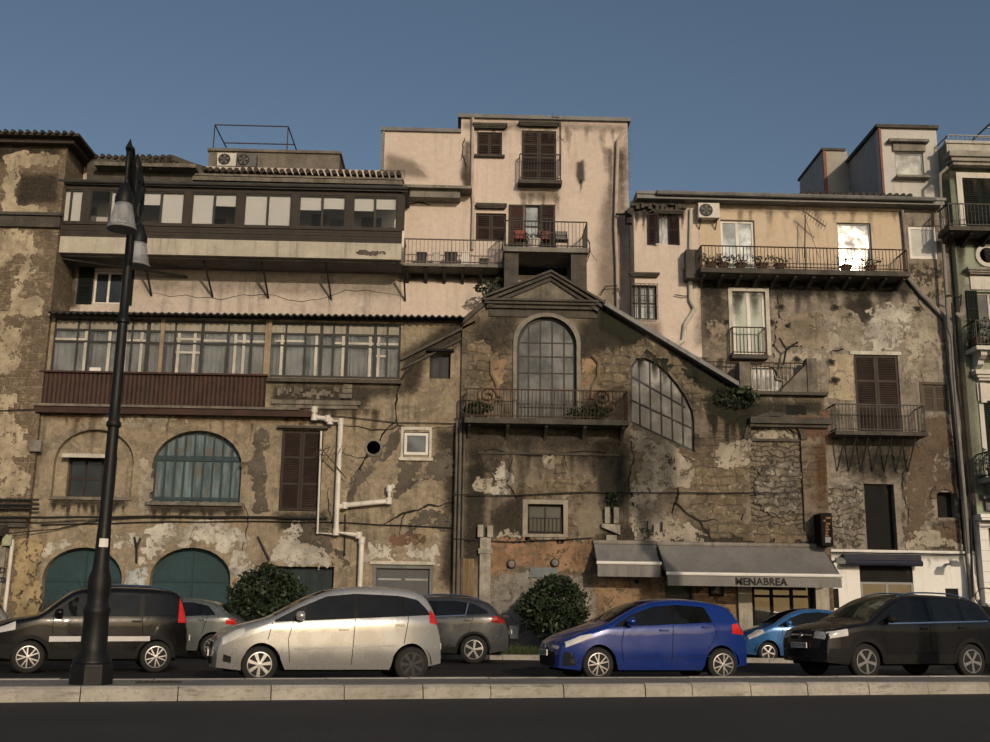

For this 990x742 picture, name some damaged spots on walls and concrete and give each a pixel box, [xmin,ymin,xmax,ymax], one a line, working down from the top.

peeling [1,150,60,212]
spalling [629,260,948,549]
peeling [135,454,154,514]
peeling [111,519,254,588]
peeling [270,515,350,570]
crack [327,374,454,529]
peeling [364,508,454,566]
crack [383,502,452,535]
peeling [472,461,514,497]
leakage [438,428,627,584]
crack [474,436,744,542]